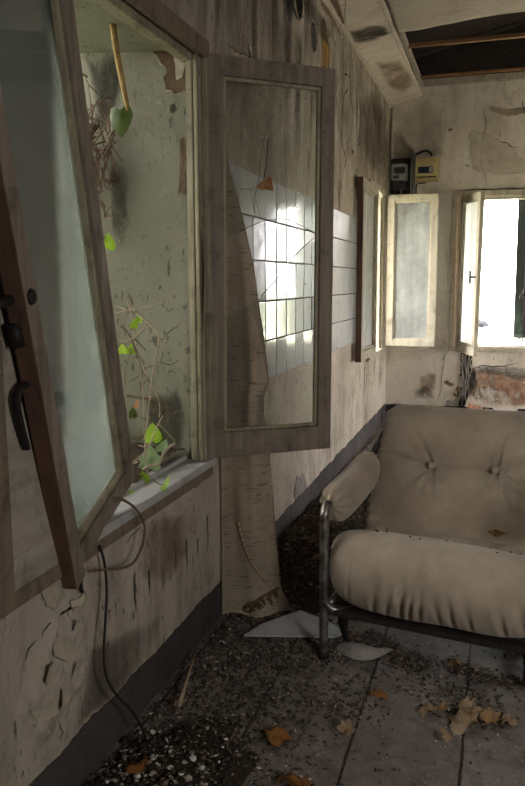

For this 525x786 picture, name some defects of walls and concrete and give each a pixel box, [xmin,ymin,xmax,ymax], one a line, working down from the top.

crack [457,117,525,191]